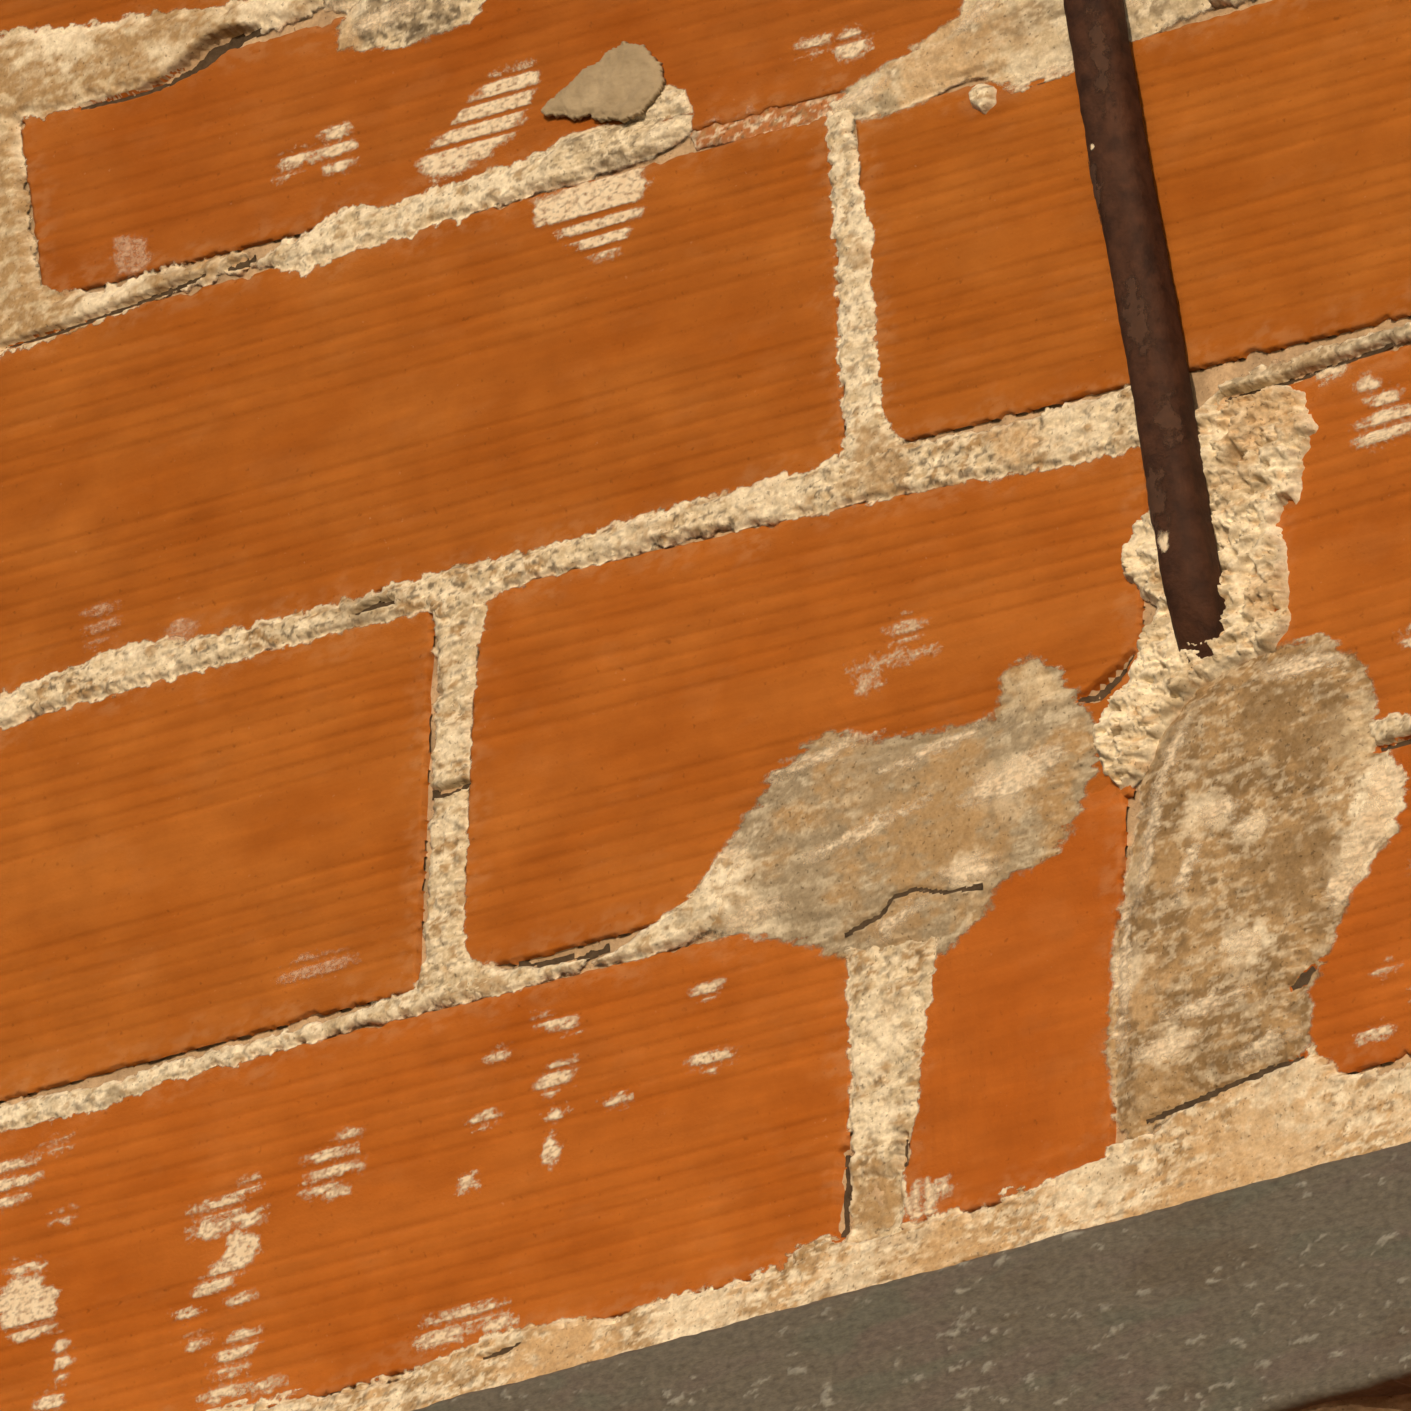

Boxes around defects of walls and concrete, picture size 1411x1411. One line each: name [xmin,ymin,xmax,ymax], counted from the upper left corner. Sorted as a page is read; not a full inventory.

crack [81,28,261,110]
water stain [281,123,357,178]
peeling [417,41,693,257]
rust [1088,153,1104,223]
rust [1153,390,1185,448]
water stain [1355,375,1411,447]
rust [1146,466,1171,534]
spalling [1078,385,1318,790]
crack [844,883,983,937]
water stain [300,1128,363,1198]
water stain [177,1175,262,1319]
water stain [0,1262,72,1410]